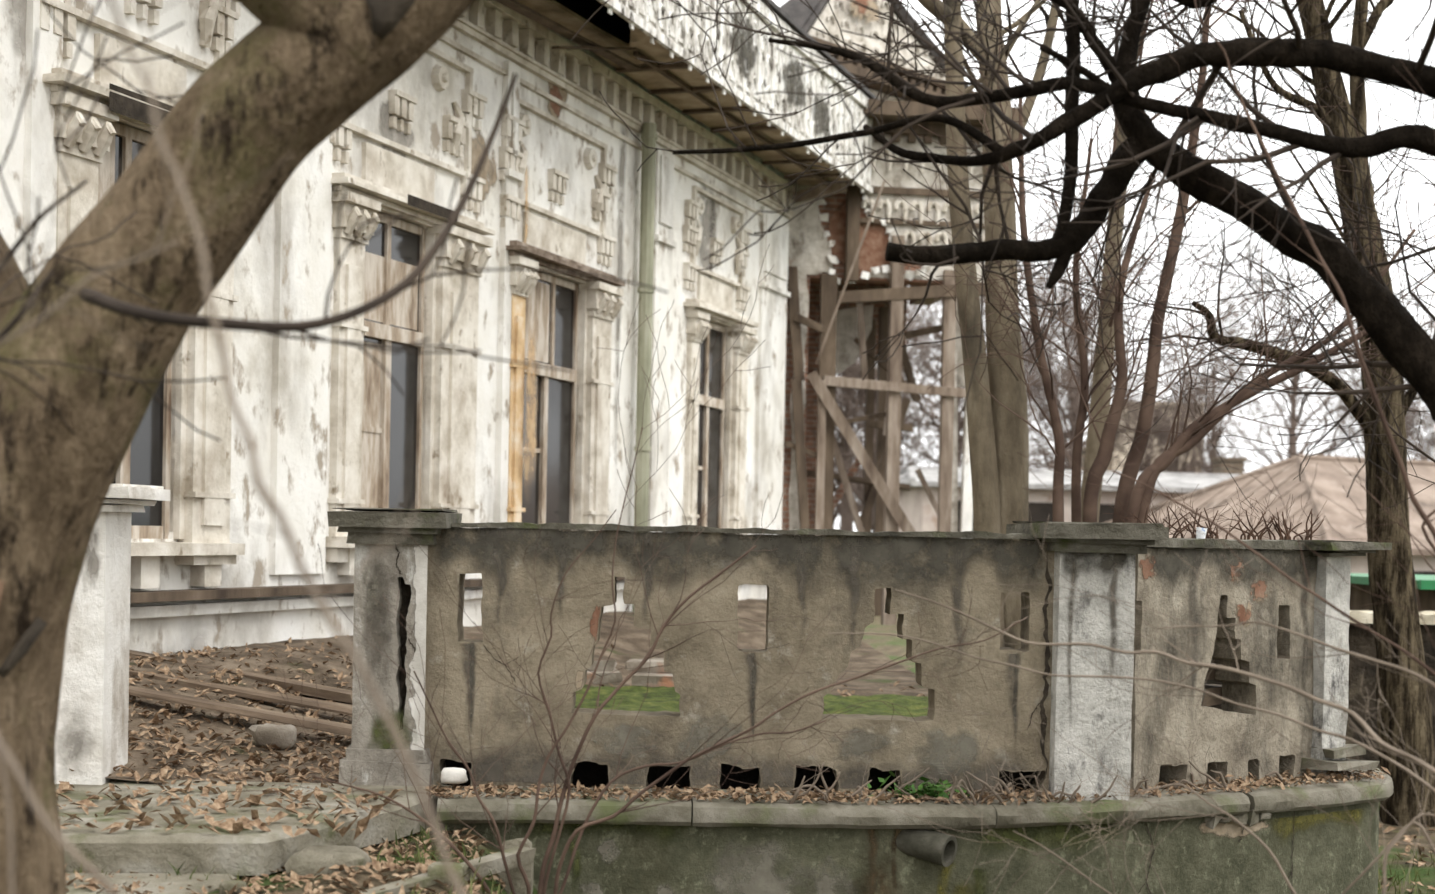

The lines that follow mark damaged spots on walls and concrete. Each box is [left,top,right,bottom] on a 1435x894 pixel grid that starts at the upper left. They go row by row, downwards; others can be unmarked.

spalling [816,193,929,285]
crack [395,544,415,724]
spalling [1229,560,1271,626]